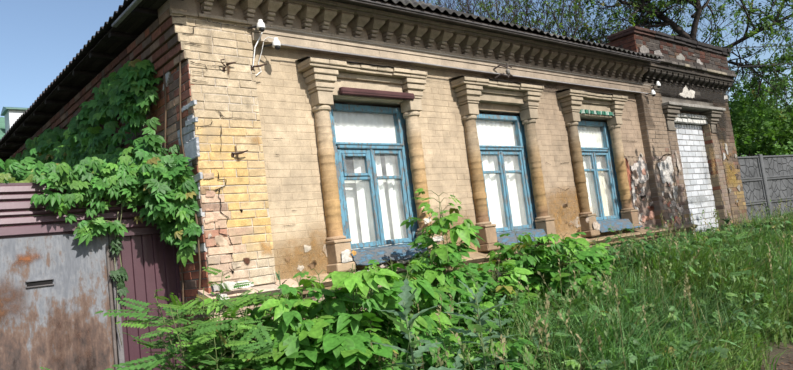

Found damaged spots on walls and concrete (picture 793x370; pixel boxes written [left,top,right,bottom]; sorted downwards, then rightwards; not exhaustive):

peeling [679,86,695,98]
peeling [183,137,200,163]
crack [205,170,233,273]
peeling [625,153,683,225]